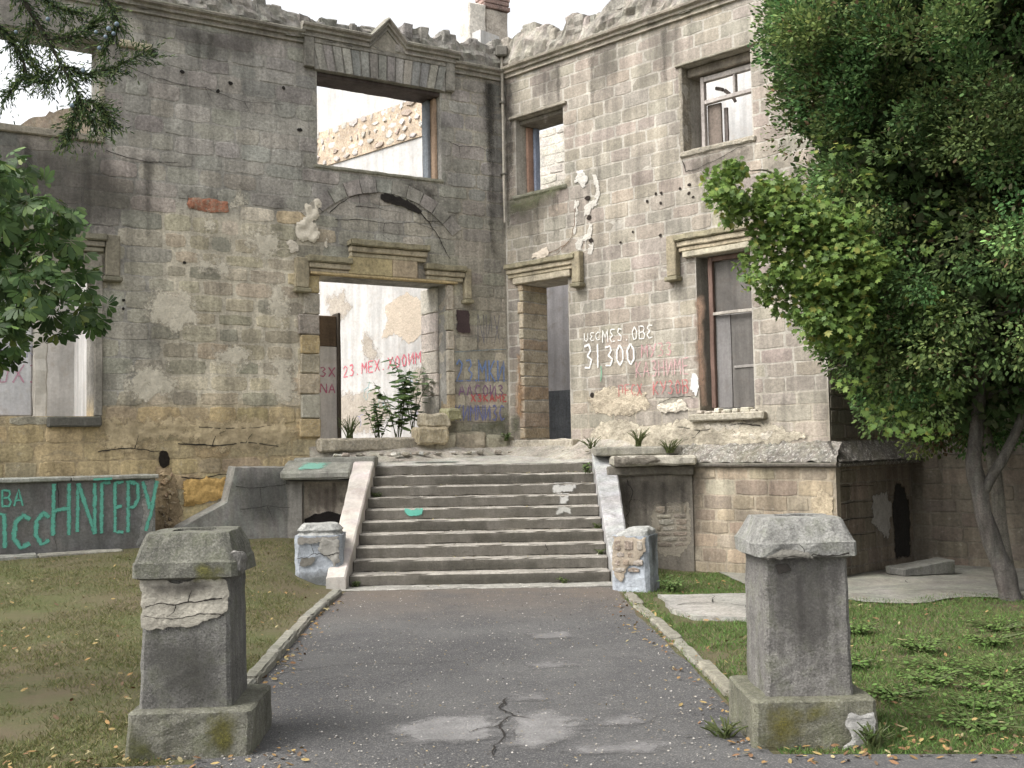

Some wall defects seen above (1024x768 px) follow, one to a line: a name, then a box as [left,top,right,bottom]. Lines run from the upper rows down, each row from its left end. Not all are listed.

peeling [245,198,328,261]
crack [330,192,449,257]
spalling [532,246,549,259]
peeling [573,170,600,255]
peeling [361,292,422,361]
crack [98,425,278,452]
spalling [587,373,806,467]
peeling [297,536,340,567]
peeling [612,501,692,582]
spalling [871,483,911,559]
crack [145,590,224,619]
crack [470,697,528,755]